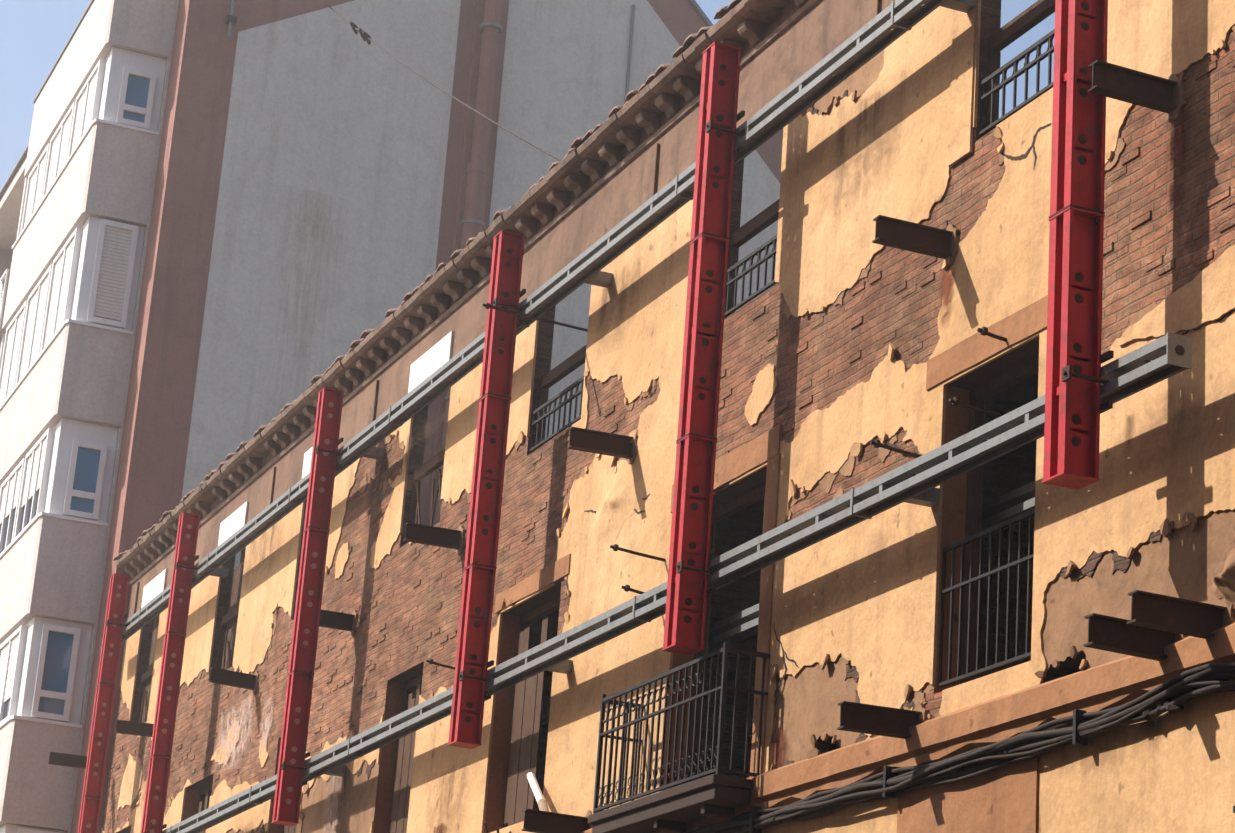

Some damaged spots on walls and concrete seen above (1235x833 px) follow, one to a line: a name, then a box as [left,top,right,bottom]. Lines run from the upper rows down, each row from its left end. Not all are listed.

flaking render [920,127,1005,243]
flaking render [1101,25,1235,354]
flaking render [583,371,661,444]
flaking render [715,246,951,460]
flaking render [491,427,627,636]
flaking render [787,427,923,522]
flaking render [166,431,471,814]
flaking render [1034,510,1235,683]
flaking render [769,654,879,769]
flaking render [902,682,942,722]
flaking render [299,760,379,833]